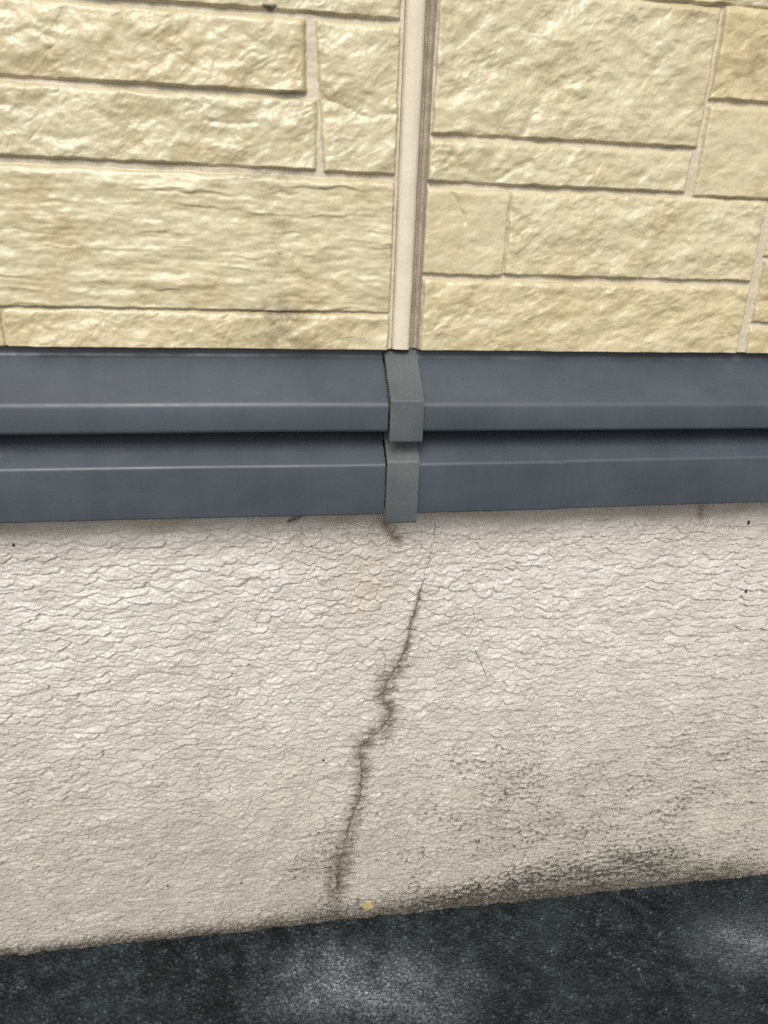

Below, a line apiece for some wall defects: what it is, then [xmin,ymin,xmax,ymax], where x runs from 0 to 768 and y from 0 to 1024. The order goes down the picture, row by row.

crack [339,525,436,873]